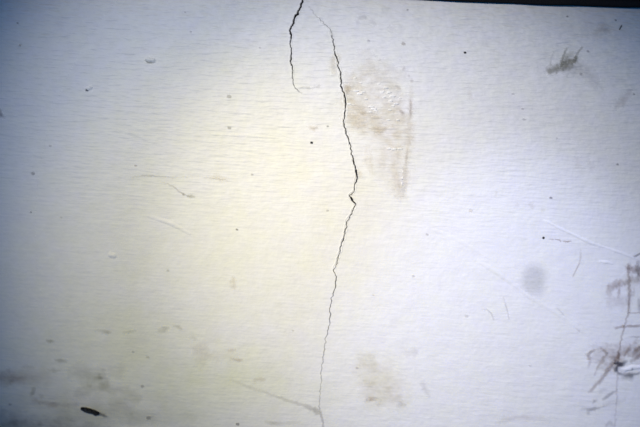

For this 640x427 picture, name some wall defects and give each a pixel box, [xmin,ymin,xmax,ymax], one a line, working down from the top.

crack [287,0,359,316]